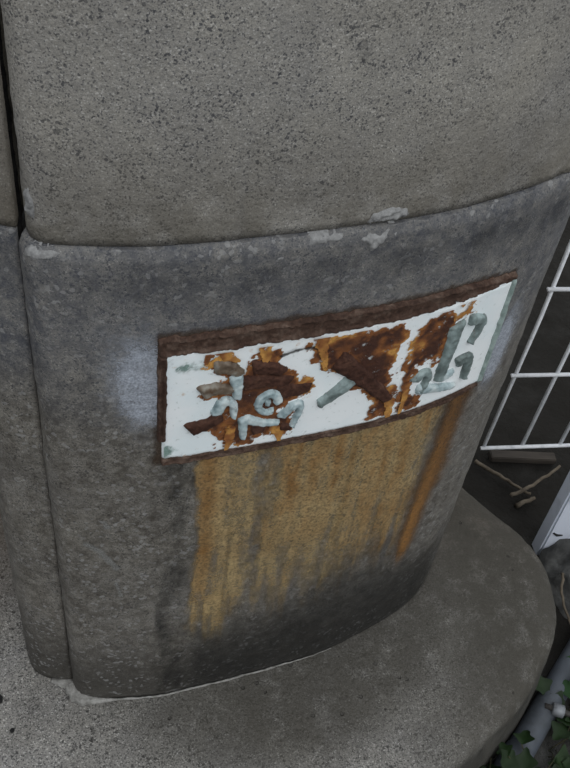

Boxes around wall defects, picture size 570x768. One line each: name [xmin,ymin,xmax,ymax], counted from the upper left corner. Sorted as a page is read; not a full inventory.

spalling [307,227,343,246]
spalling [361,207,409,251]
rust [190,300,477,634]